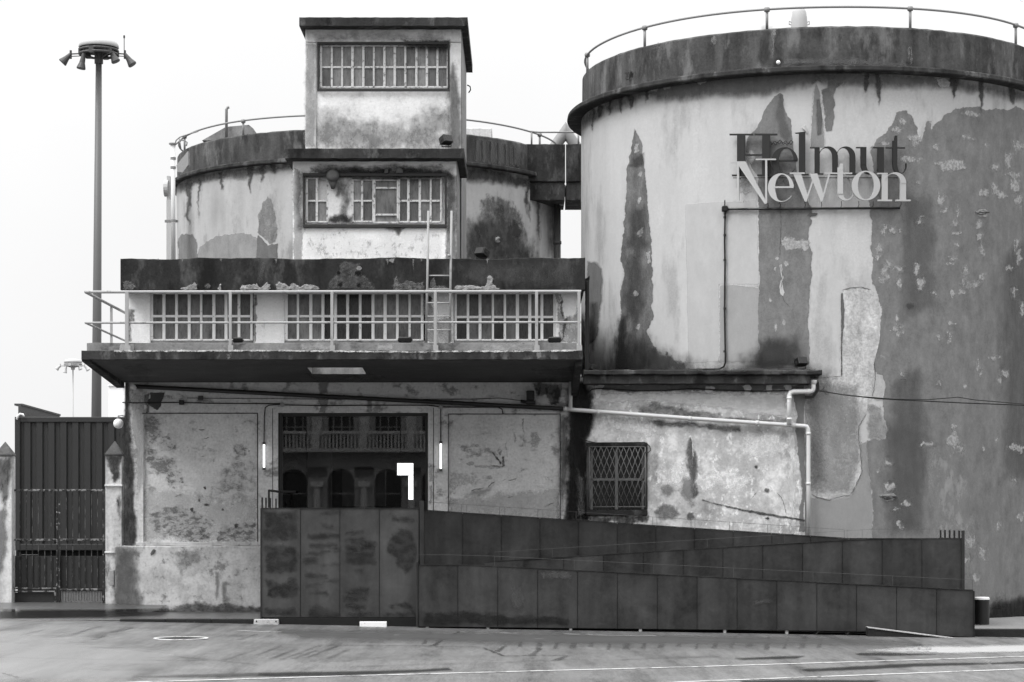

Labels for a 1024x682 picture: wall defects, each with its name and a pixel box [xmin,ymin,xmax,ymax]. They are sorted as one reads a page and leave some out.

leakage [582,47,1024,127]
peeling [810,80,841,148]
leakage [116,296,269,359]
leakage [179,164,290,220]
spalling [240,261,374,290]
leakage [284,66,603,358]
peeling [616,130,657,356]
leakage [603,340,690,370]
peeling [740,93,818,365]
peeling [806,106,1024,613]
leakage [0,382,260,612]
leakage [449,381,806,532]